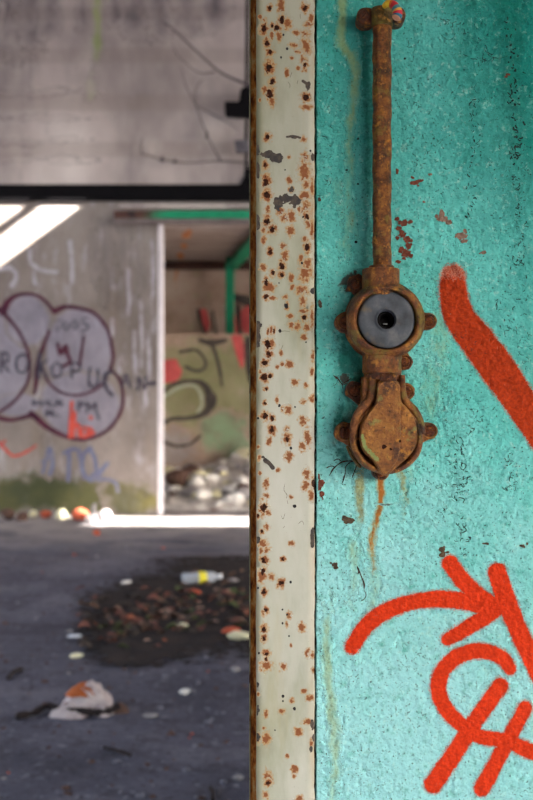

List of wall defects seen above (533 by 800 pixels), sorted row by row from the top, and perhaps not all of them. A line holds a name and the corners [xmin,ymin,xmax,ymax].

rust [257,0,314,112]
peeling [257,145,286,179]
peeling [273,186,304,218]
peeling [435,208,452,225]
peeling [394,217,413,264]
peeling [455,229,468,243]
rust [257,134,314,675]
rust [343,463,414,614]
rust [257,688,314,749]
rust [261,766,275,800]
rust [284,753,300,780]